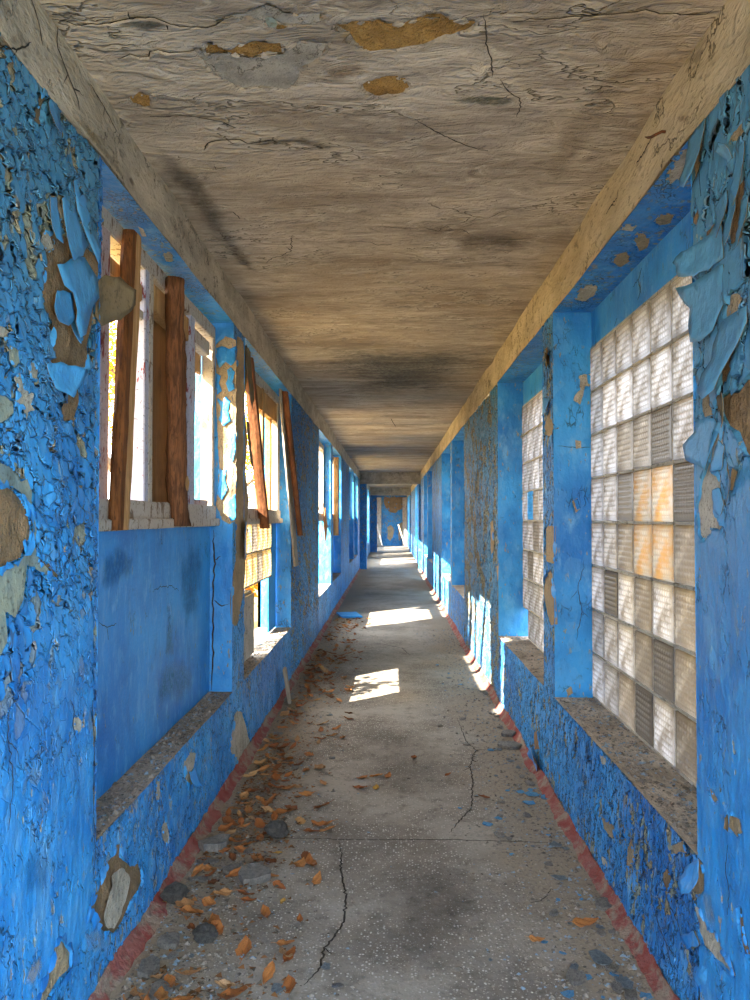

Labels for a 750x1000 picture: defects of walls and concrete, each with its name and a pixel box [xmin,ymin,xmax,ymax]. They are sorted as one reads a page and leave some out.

crack [0,0,237,131]
spalling [333,14,475,51]
crack [483,16,522,115]
crack [513,9,719,27]
crack [150,115,277,152]
crack [415,119,487,151]
peeling [0,178,136,425]
peeling [673,121,750,544]
peeling [216,336,255,630]
peeling [0,459,59,656]
spalling [86,840,144,941]
crack [264,724,548,985]